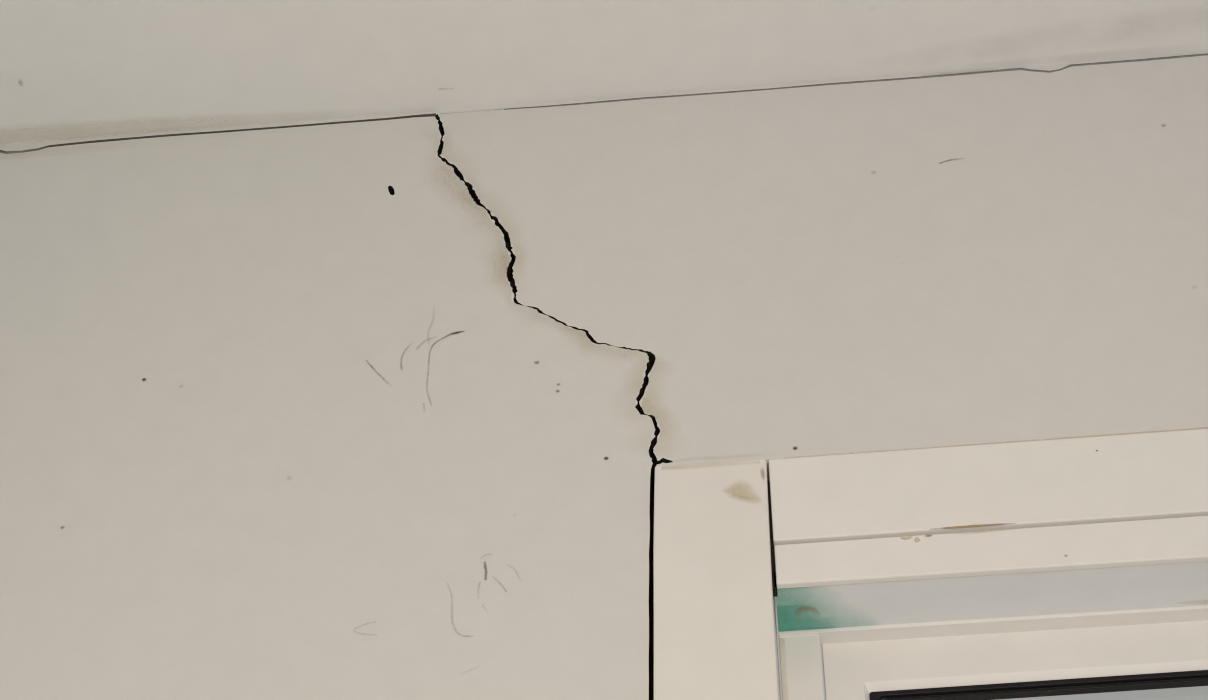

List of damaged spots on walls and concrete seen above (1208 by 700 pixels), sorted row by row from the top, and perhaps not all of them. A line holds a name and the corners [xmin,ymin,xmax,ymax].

crack [0,113,673,700]